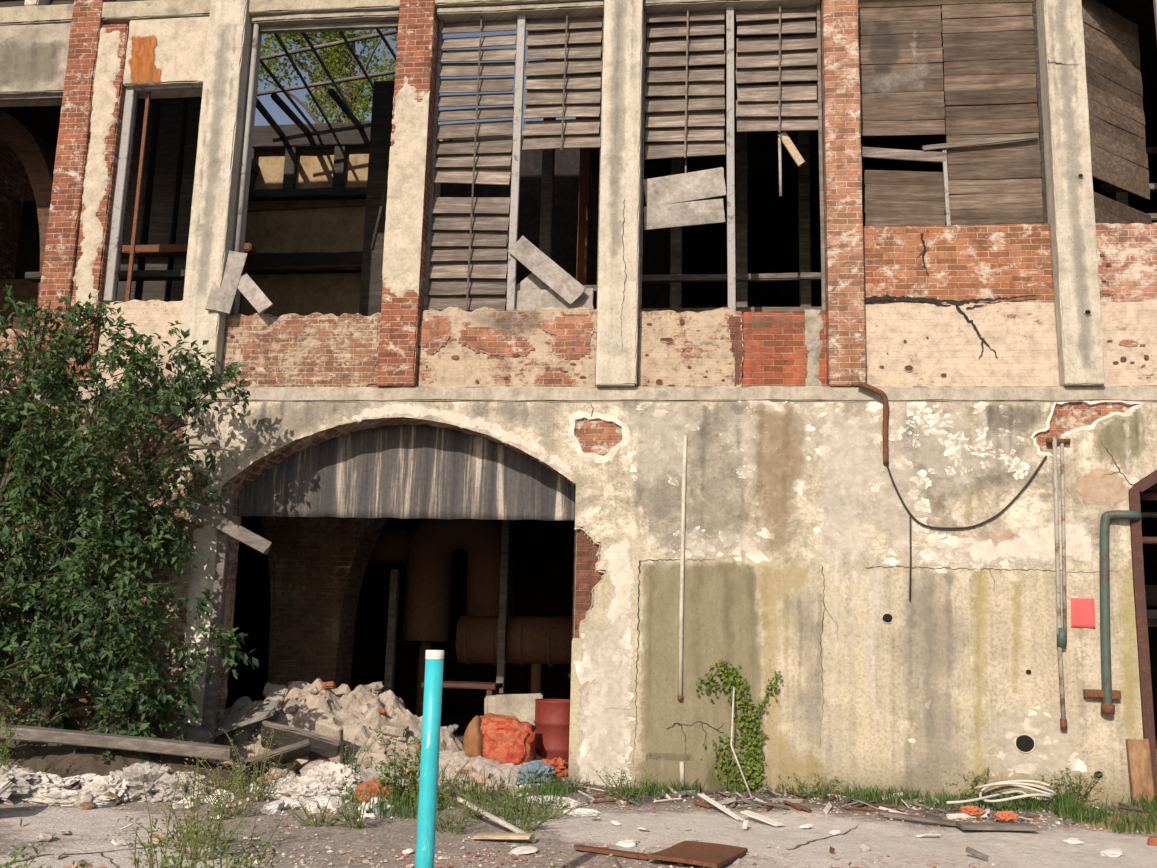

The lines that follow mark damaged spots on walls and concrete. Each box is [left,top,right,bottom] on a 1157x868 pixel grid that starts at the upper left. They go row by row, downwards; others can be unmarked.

corrosion [128,35,161,84]
peeling [73,28,121,329]
crack [864,233,1036,360]
spalling [418,315,535,367]
spalling [542,313,594,378]
spalling [722,315,744,385]
peeling [805,309,823,386]
spalling [1106,339,1149,364]
peeling [339,402,699,486]
peeling [719,399,1145,573]
peeling [573,527,637,787]
water stain [640,564,761,790]